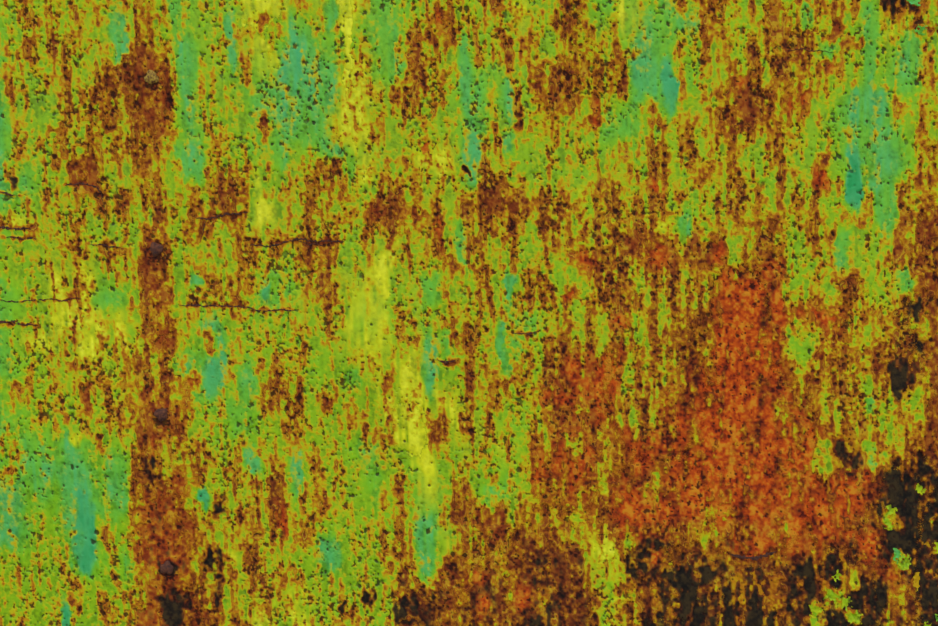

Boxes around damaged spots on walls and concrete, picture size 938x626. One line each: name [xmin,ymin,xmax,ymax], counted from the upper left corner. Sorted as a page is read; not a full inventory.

corrosion [722,66,765,137]
corrosion [811,149,838,197]
crack [0,226,36,240]
crack [250,238,344,247]
crack [0,297,81,326]
corrosion [48,0,202,626]
crack [178,304,296,312]
corrosion [441,208,917,626]
peeling [884,505,898,530]
peeling [893,548,920,591]
peeling [808,569,863,625]